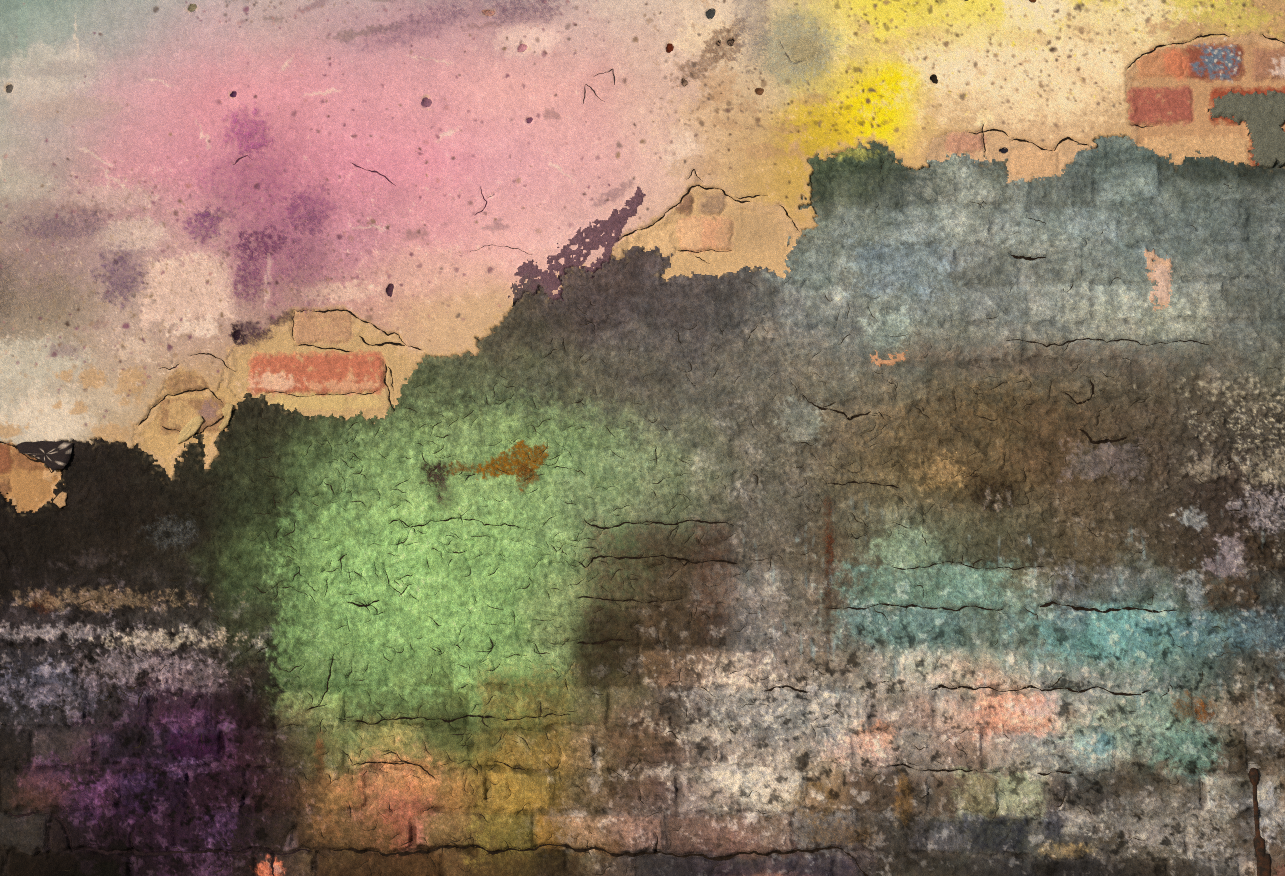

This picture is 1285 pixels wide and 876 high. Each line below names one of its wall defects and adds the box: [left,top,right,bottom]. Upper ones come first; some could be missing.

spalling [1124,32,1285,168]
spalling [508,183,805,307]
spalling [132,308,423,480]
spalling [0,441,73,513]
corrosion [449,440,548,491]
corrosion [1248,768,1271,876]